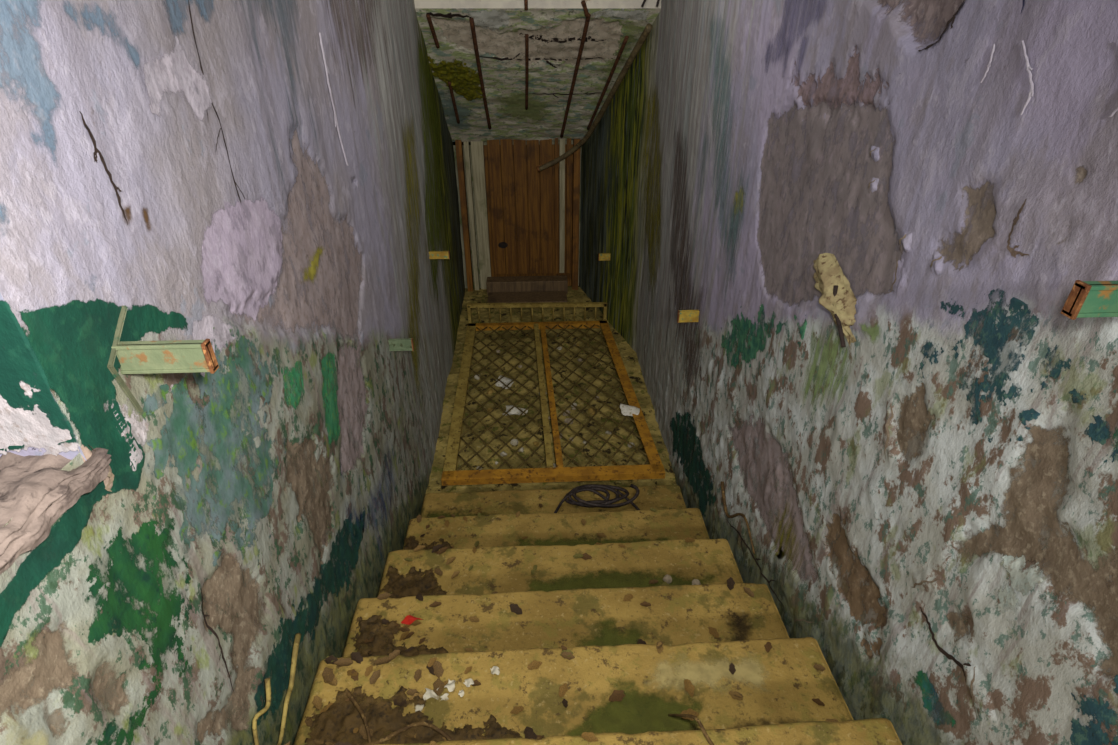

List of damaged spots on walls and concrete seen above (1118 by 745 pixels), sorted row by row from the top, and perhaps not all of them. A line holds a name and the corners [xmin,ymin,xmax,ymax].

crack [188,0,204,78]
spalling [426,0,649,138]
flaking render [878,0,965,48]
crack [79,111,128,225]
crack [207,103,245,205]
flaking render [721,45,904,369]
flaking render [938,181,996,271]
peeling [0,130,369,745]
flaking render [893,289,1118,745]
crack [919,607,971,680]